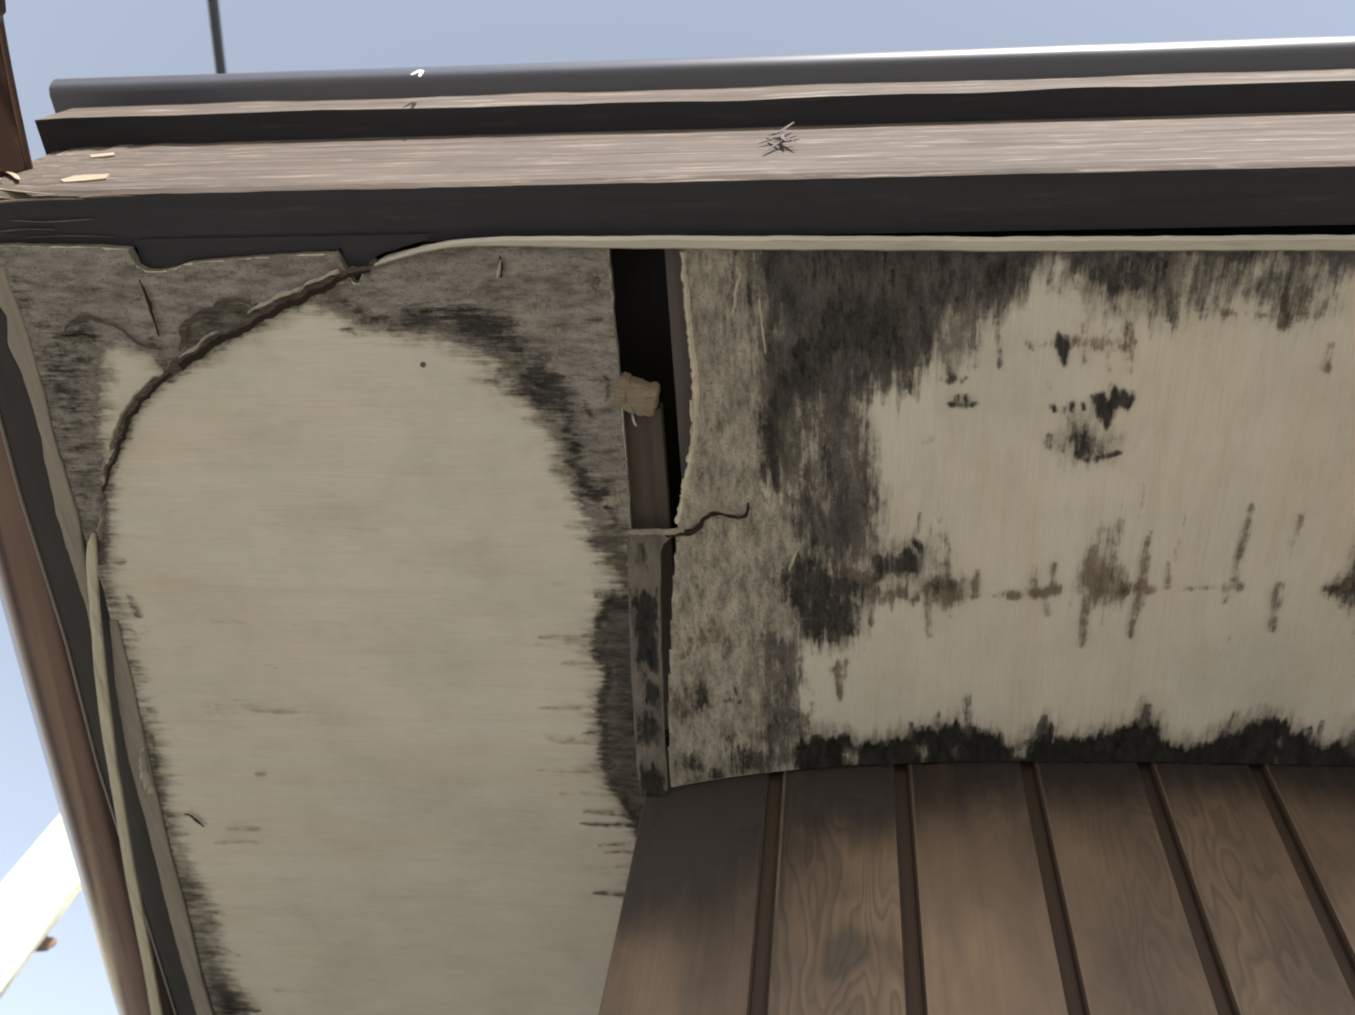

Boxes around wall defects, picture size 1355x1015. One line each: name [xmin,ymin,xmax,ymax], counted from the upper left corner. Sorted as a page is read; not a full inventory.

crack [55,259,380,555]
damp [0,246,768,927]
damp [735,250,1355,701]
damp [141,701,260,1015]
damp [780,698,1355,864]